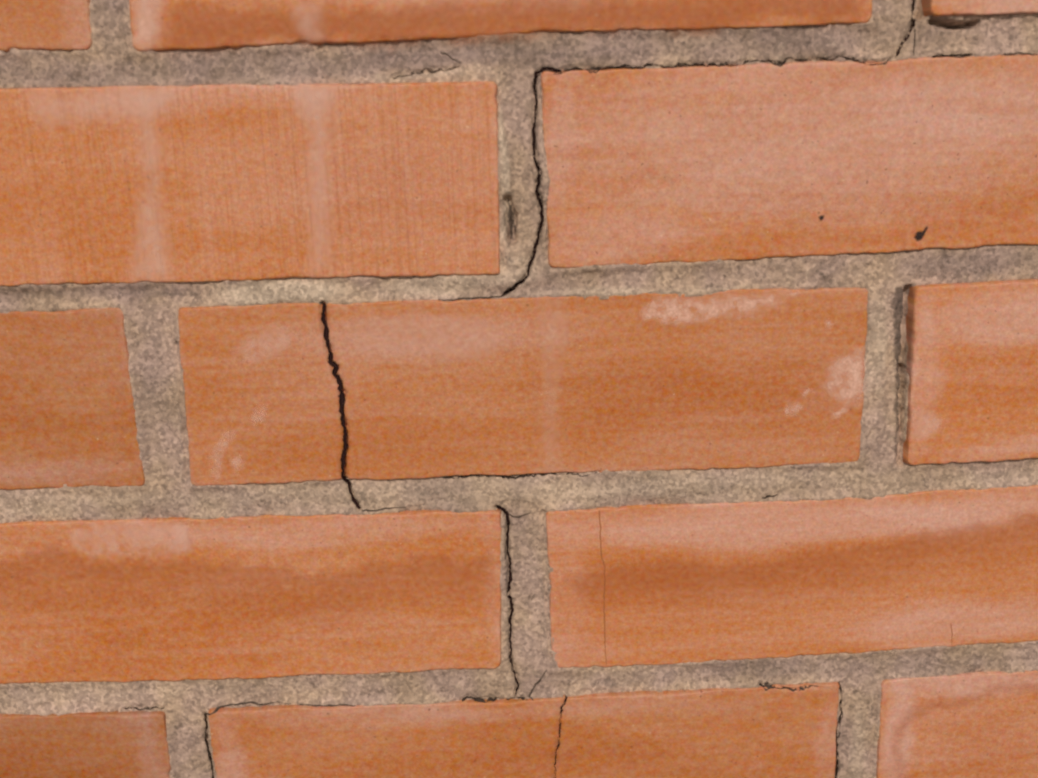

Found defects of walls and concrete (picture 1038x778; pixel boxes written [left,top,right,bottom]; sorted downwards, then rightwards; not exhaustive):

crack [438,0,972,301]
crack [321,303,406,512]
crack [443,471,600,479]
crack [462,505,547,703]
crack [204,701,353,778]
crack [554,695,567,778]
crack [759,681,843,778]